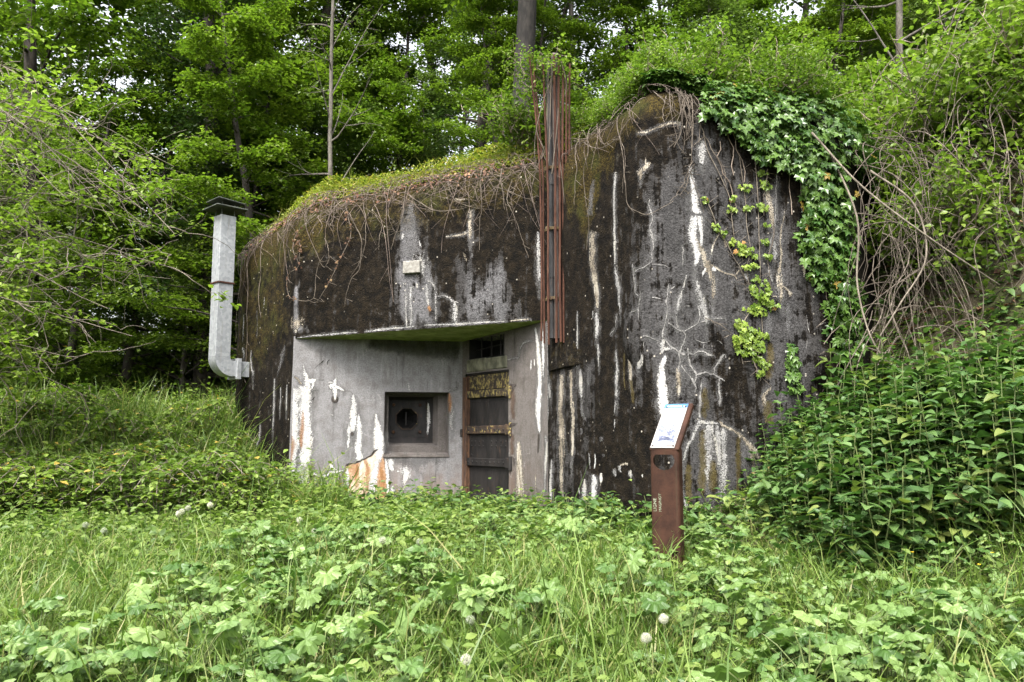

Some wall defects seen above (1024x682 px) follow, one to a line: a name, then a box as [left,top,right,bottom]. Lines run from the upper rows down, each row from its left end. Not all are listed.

water stain [300,283,583,503]
water stain [589,232,600,365]
water stain [657,356,682,415]
crack [610,159,760,460]
water stain [688,140,716,325]